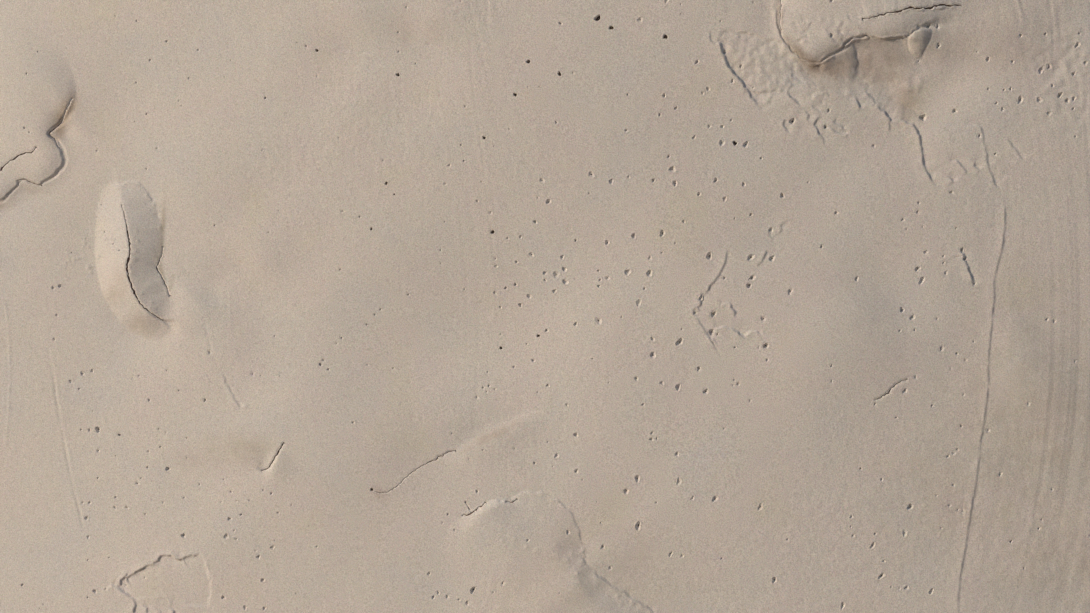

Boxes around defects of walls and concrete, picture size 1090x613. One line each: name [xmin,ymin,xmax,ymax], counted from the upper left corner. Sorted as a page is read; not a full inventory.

flaking render [690,0,1078,206]
crack [262,442,285,472]
crack [374,449,455,495]
peeling [90,531,228,613]